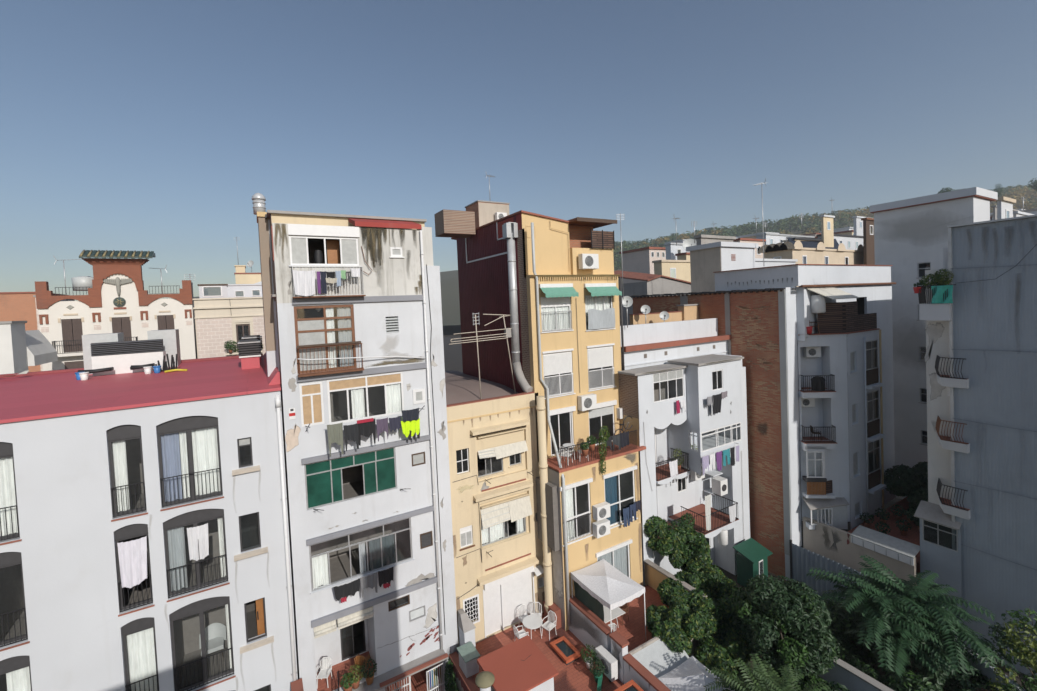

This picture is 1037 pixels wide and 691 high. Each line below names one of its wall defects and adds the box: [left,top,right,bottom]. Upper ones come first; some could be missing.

water stain [275,223,287,250]
water stain [361,228,402,254]
peeling [400,625,440,657]